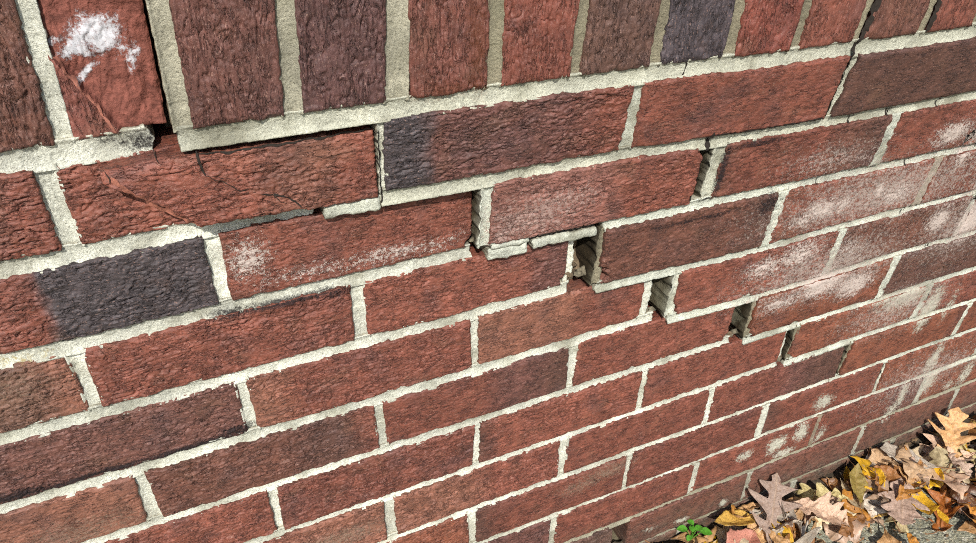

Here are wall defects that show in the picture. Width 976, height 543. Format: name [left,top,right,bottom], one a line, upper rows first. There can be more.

leakage [47,15,140,81]
spalling [37,0,166,134]
crack [143,0,172,162]
crack [195,128,383,208]
crack [565,240,586,280]
leakage [714,119,976,346]
crack [726,328,739,337]